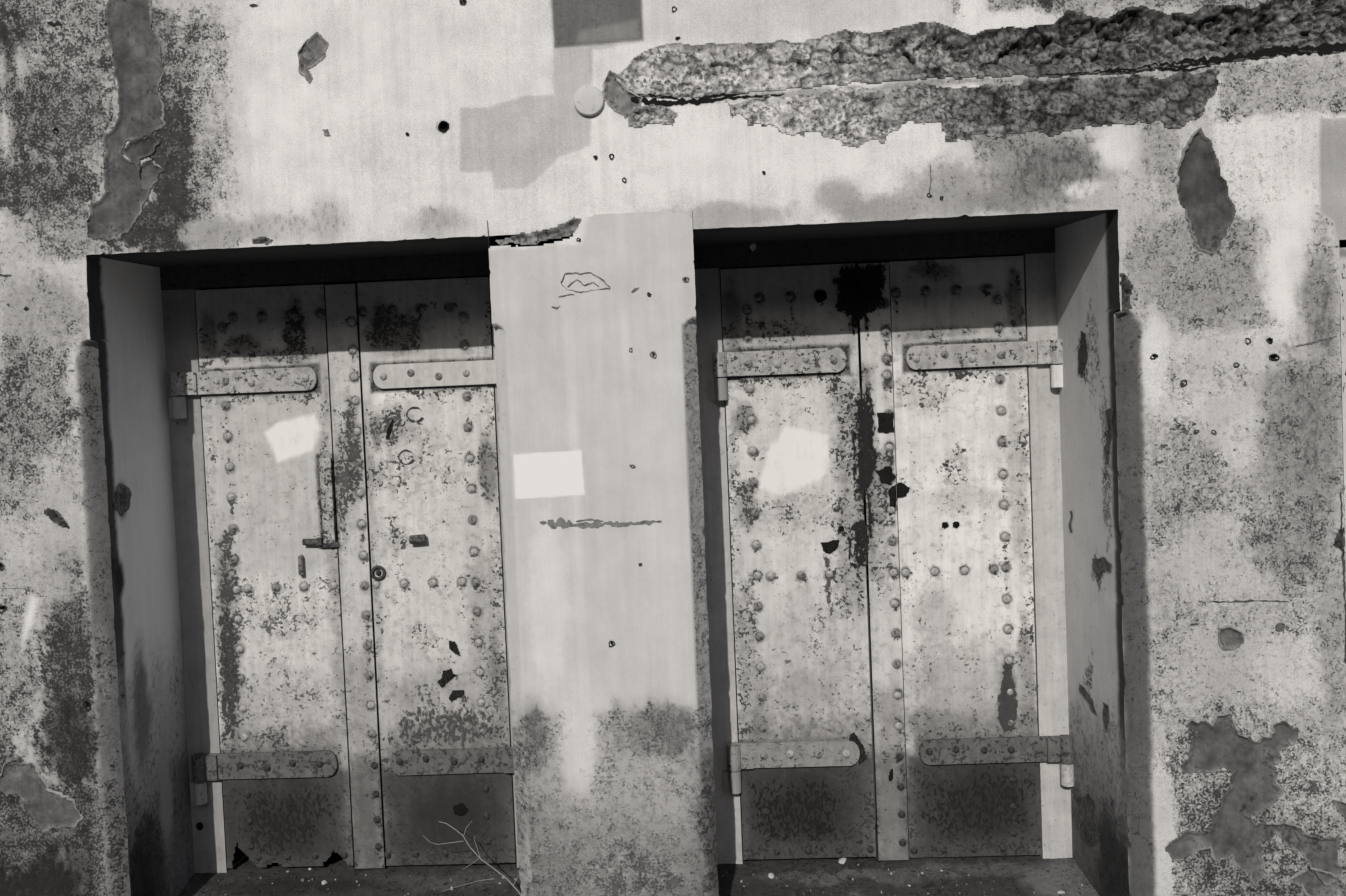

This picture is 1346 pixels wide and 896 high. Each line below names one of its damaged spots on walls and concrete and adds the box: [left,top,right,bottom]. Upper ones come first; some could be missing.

peeling [297,32,328,83]
peeling [85,0,166,241]
spalling [602,0,1346,256]
spalling [495,217,581,246]
rust [814,262,886,347]
rust [821,381,910,615]
rust [216,611,240,739]
rust [997,662,1018,732]
peeling [0,761,84,833]
peeling [1165,710,1342,896]
peeling [1335,800,1346,819]
water stain [0,844,80,896]